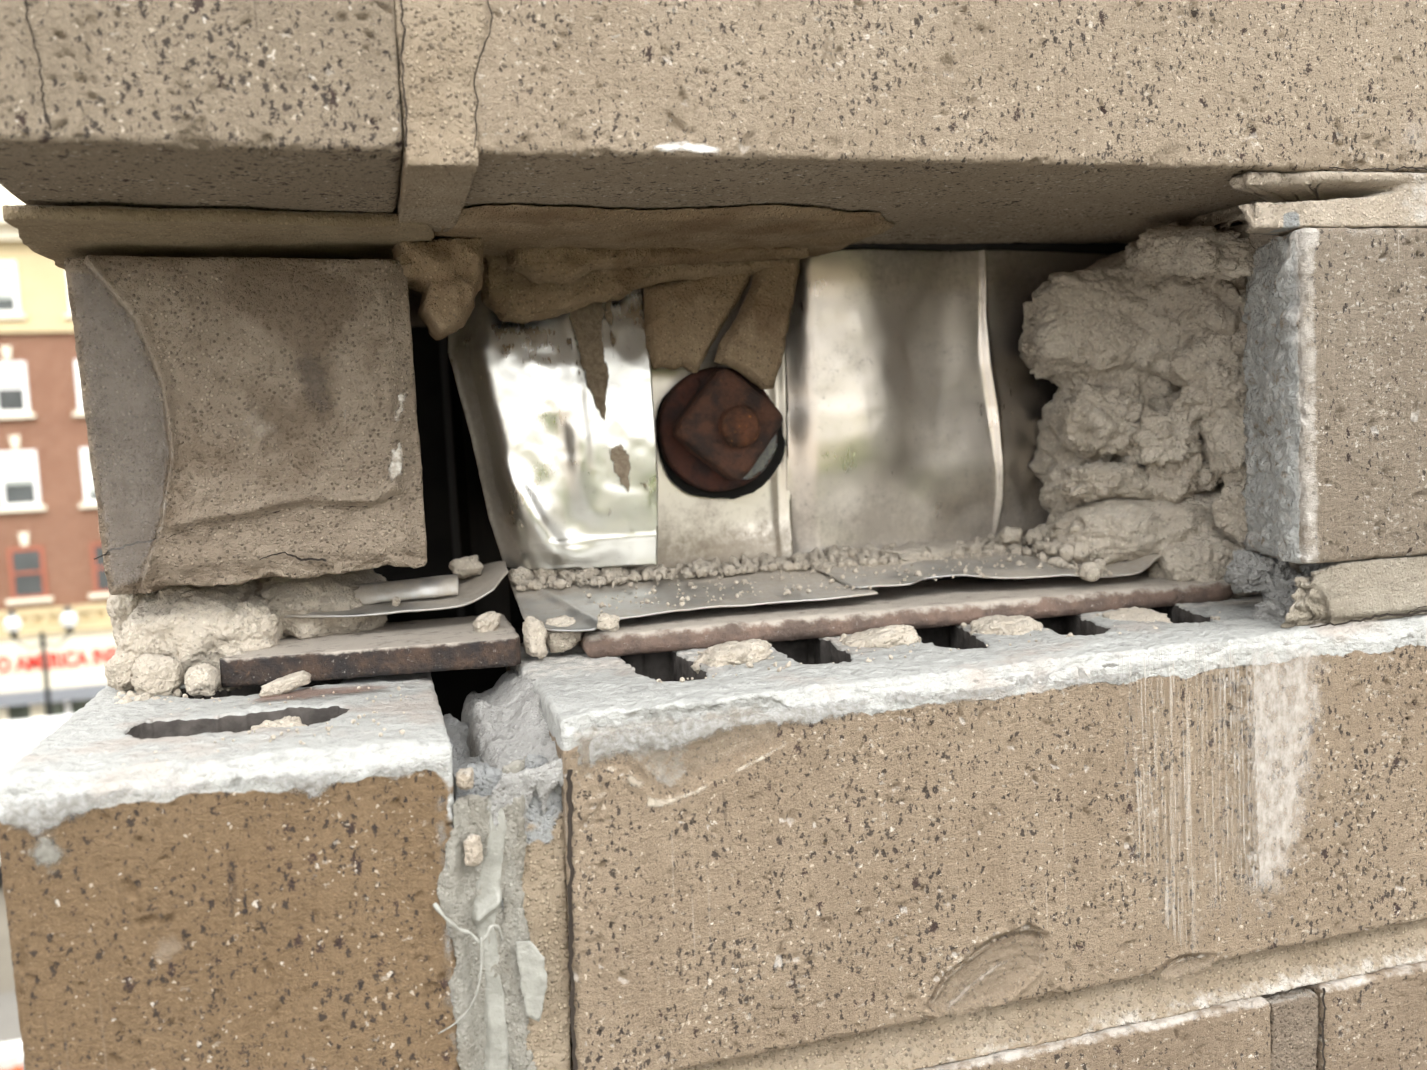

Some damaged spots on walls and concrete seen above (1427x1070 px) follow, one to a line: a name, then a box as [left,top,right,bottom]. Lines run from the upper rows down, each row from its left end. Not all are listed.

crack [25,0,51,130]
crack [400,0,408,147]
crack [473,0,493,148]
peeling [389,443,402,479]
peeling [742,434,777,479]
damp [1224,651,1310,880]
crack [566,769,578,1070]